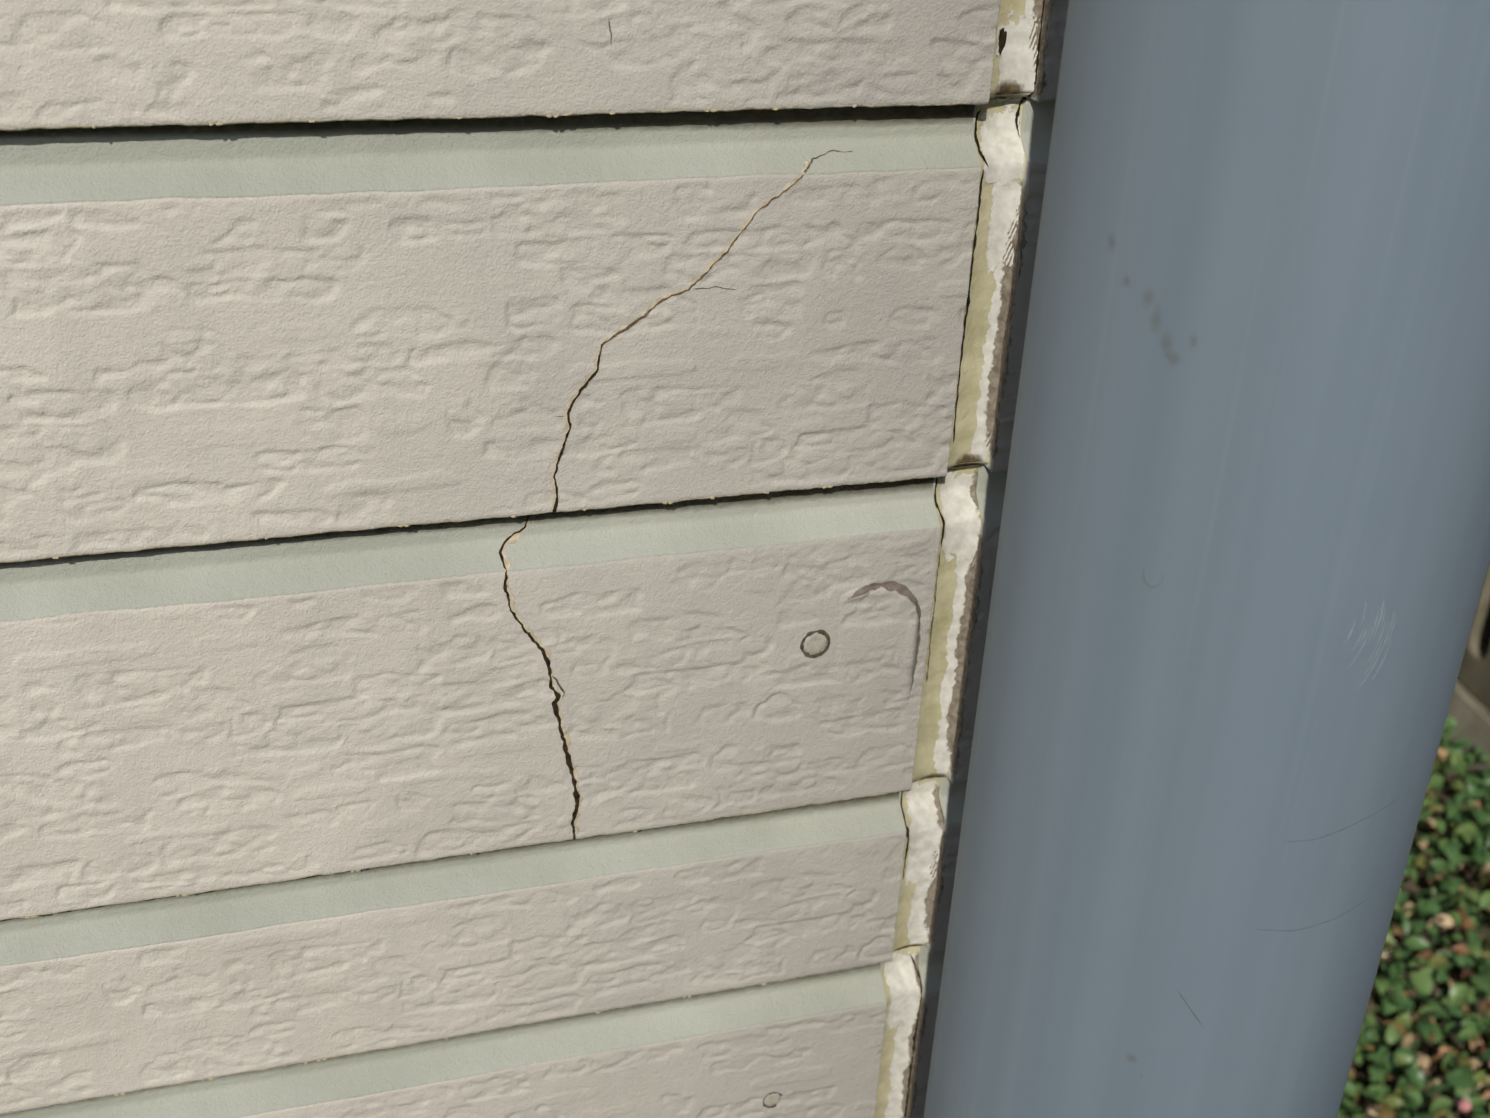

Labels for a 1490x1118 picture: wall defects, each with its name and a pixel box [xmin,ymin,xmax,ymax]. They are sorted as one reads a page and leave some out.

peeling [0,0,1041,1118]
crack [499,150,852,840]